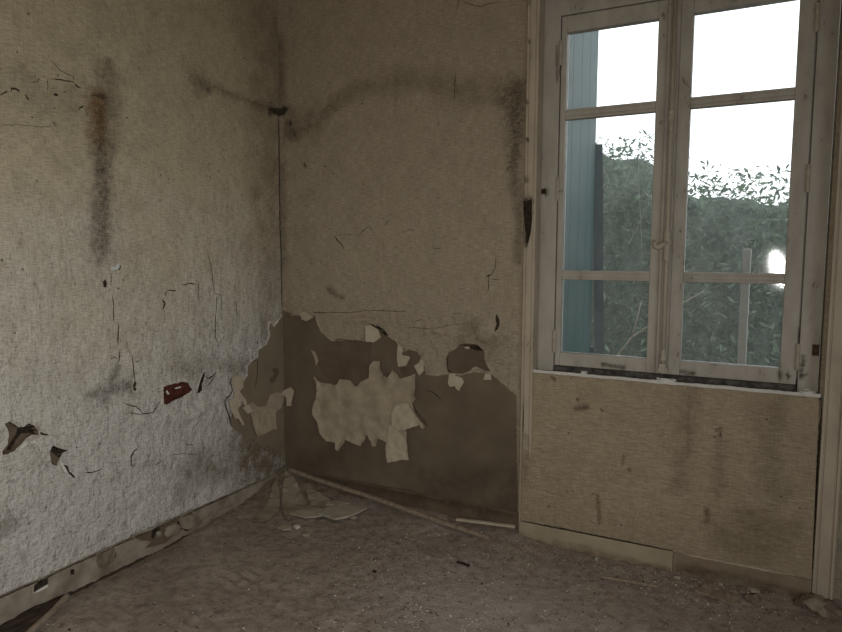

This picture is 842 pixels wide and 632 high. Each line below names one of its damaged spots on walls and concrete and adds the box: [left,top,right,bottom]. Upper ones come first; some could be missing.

crack [182,253,237,347]
flaking render [159,369,216,408]
peeling [224,310,518,511]
spalling [0,418,48,459]
spalling [47,444,75,478]